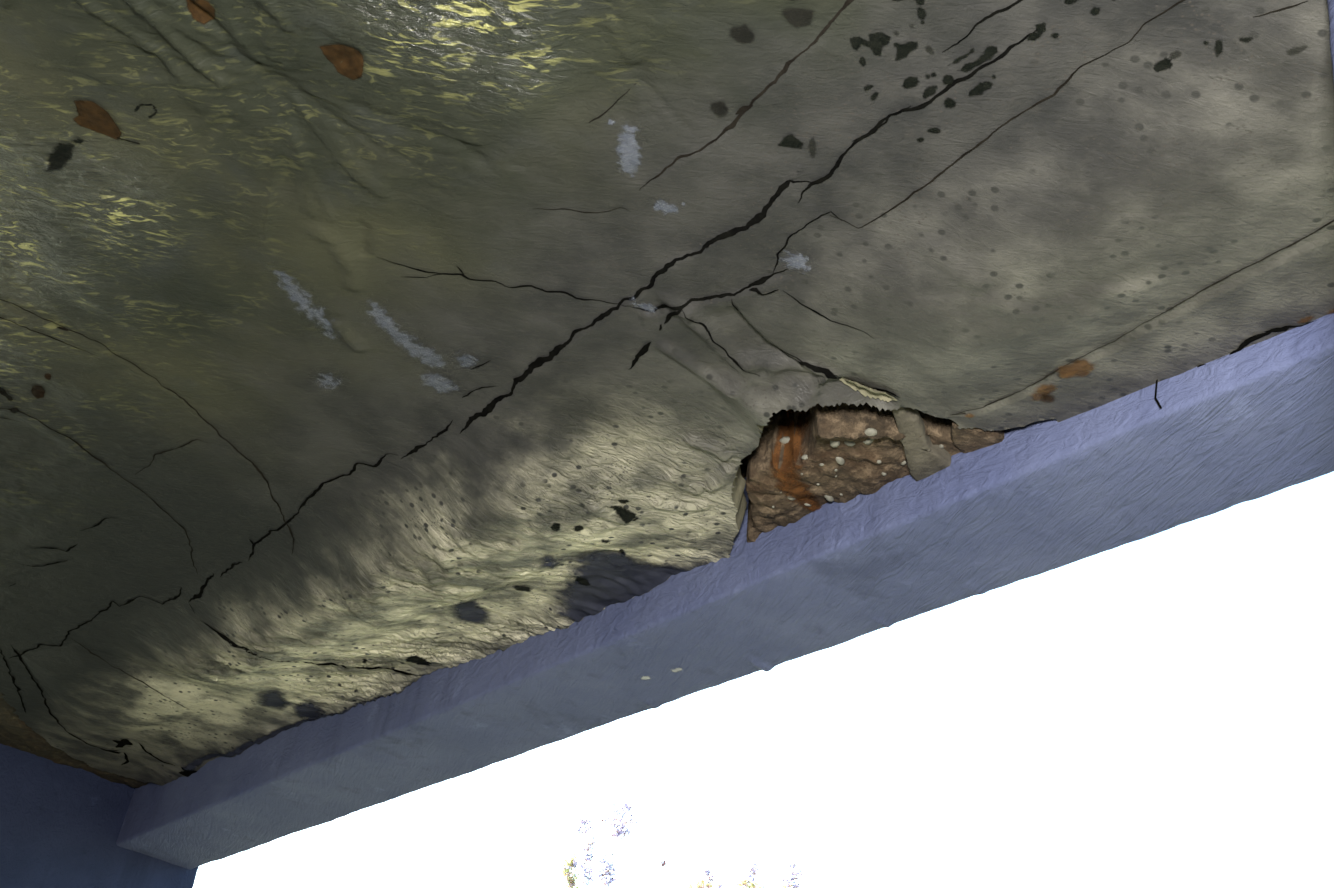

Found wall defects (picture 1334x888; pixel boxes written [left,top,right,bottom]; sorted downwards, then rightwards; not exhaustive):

crack [1254,1,1307,17]
crack [0,0,1184,777]
spalling [731,377,1005,547]
crack [952,220,1334,415]
water stain [451,601,488,624]
water stain [541,550,708,622]